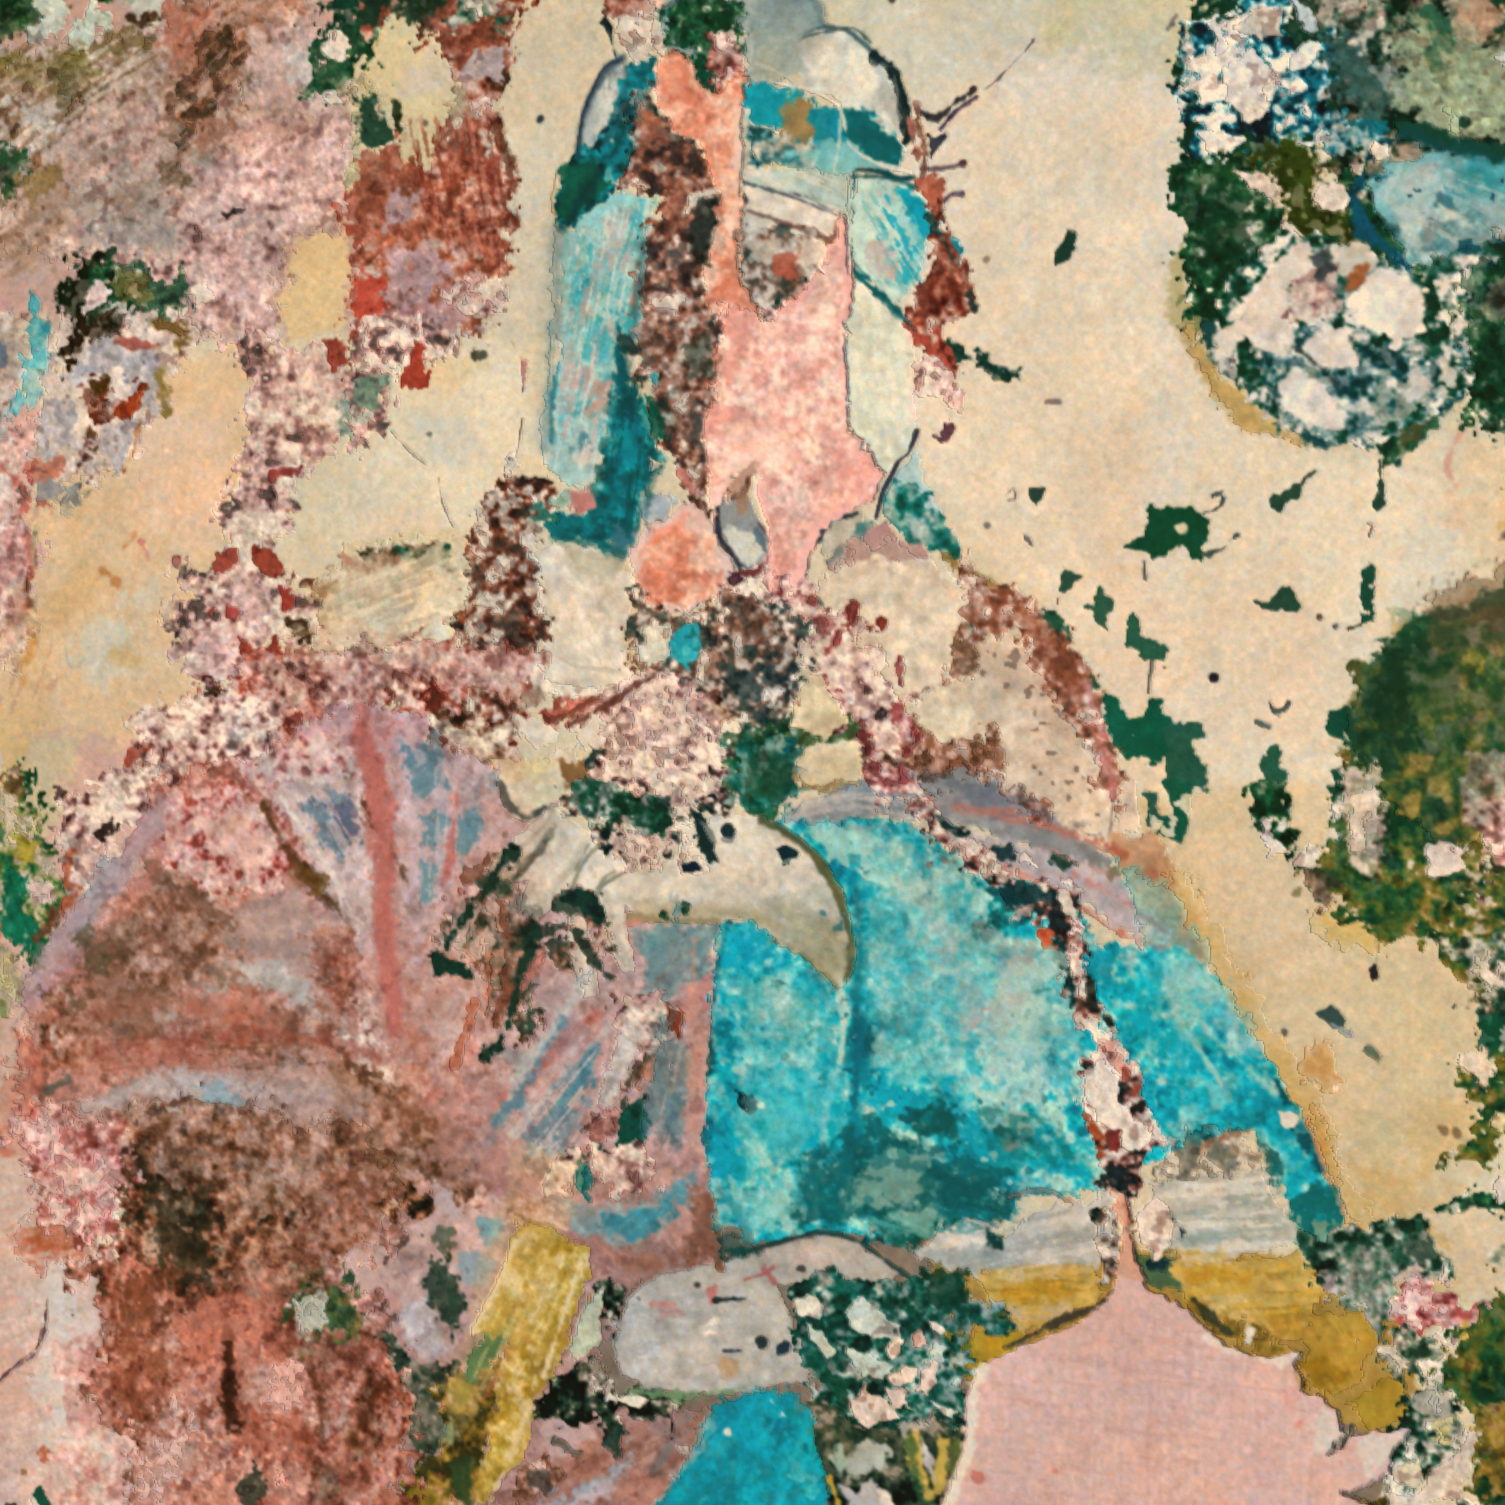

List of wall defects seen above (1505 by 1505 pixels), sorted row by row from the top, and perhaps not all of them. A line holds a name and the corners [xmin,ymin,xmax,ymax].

crack [0,1299,49,1383]